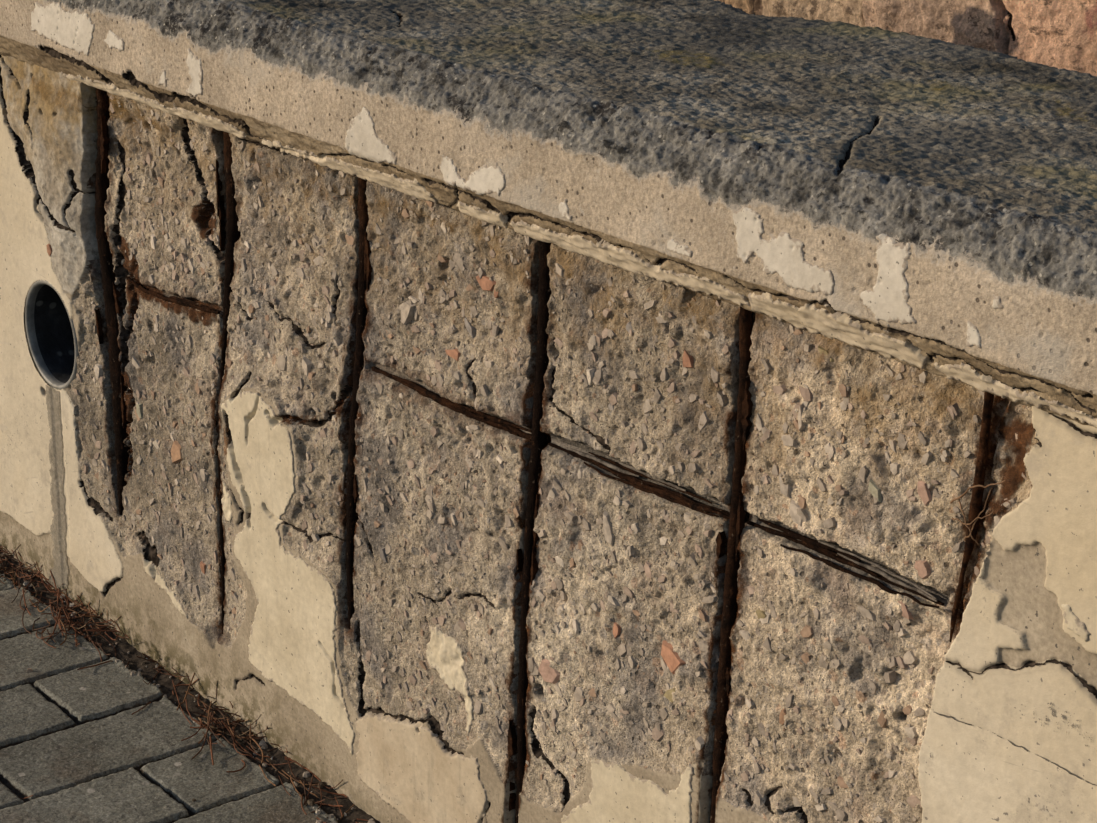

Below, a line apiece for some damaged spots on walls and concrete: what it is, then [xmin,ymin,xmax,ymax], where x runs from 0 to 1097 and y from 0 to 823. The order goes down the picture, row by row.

peeling [185,48,204,97]
crack [0,54,138,453]
crack [40,45,294,265]
rust [120,236,222,326]
peeling [440,155,506,197]
crack [321,153,697,273]
spalling [60,69,437,756]
crack [725,275,1097,447]
spalling [282,181,1097,823]
rust [985,418,1034,536]
crack [946,659,1097,699]
crack [742,786,808,823]